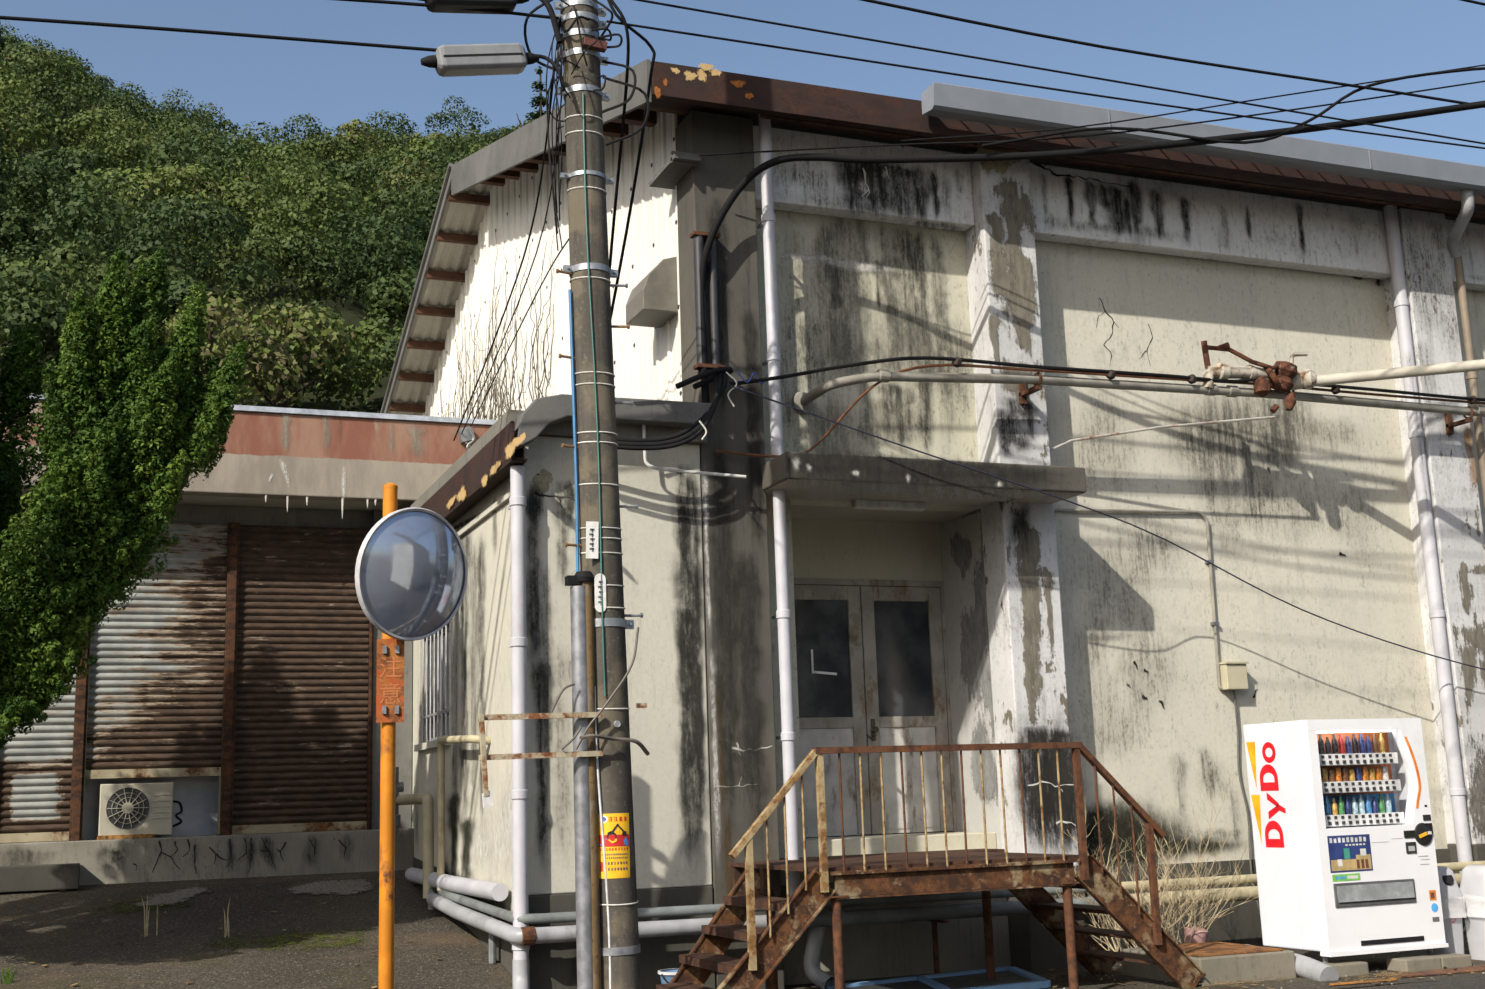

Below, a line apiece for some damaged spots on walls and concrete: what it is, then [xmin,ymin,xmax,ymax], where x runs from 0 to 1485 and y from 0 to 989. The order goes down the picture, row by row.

damp [709,208,764,537]
damp [786,162,1049,500]
peeling [977,148,1048,409]
damp [1043,176,1190,238]
damp [453,491,510,802]
damp [527,485,575,852]
corrosion [716,688,724,798]
damp [676,453,765,837]
peeling [950,508,998,806]
peeling [998,483,1055,727]
peeling [1452,561,1485,707]
peeling [1465,733,1485,841]